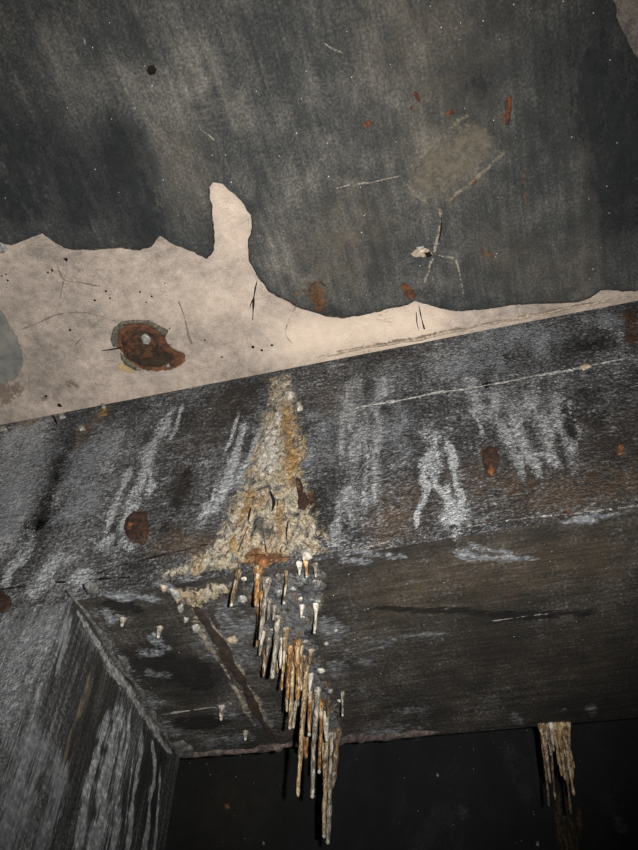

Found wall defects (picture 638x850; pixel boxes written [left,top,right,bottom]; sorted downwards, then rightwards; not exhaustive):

peeling [613,0,638,57]
rust [295,281,328,312]
peeling [0,182,638,432]
crack [424,211,464,295]
rust [121,508,150,545]
efflorescence [196,416,264,529]
water stain [298,367,415,549]
efflorescence [413,426,471,539]
crack [299,357,631,418]
rust [480,446,500,478]
water stain [440,323,612,483]
water stain [0,567,440,850]